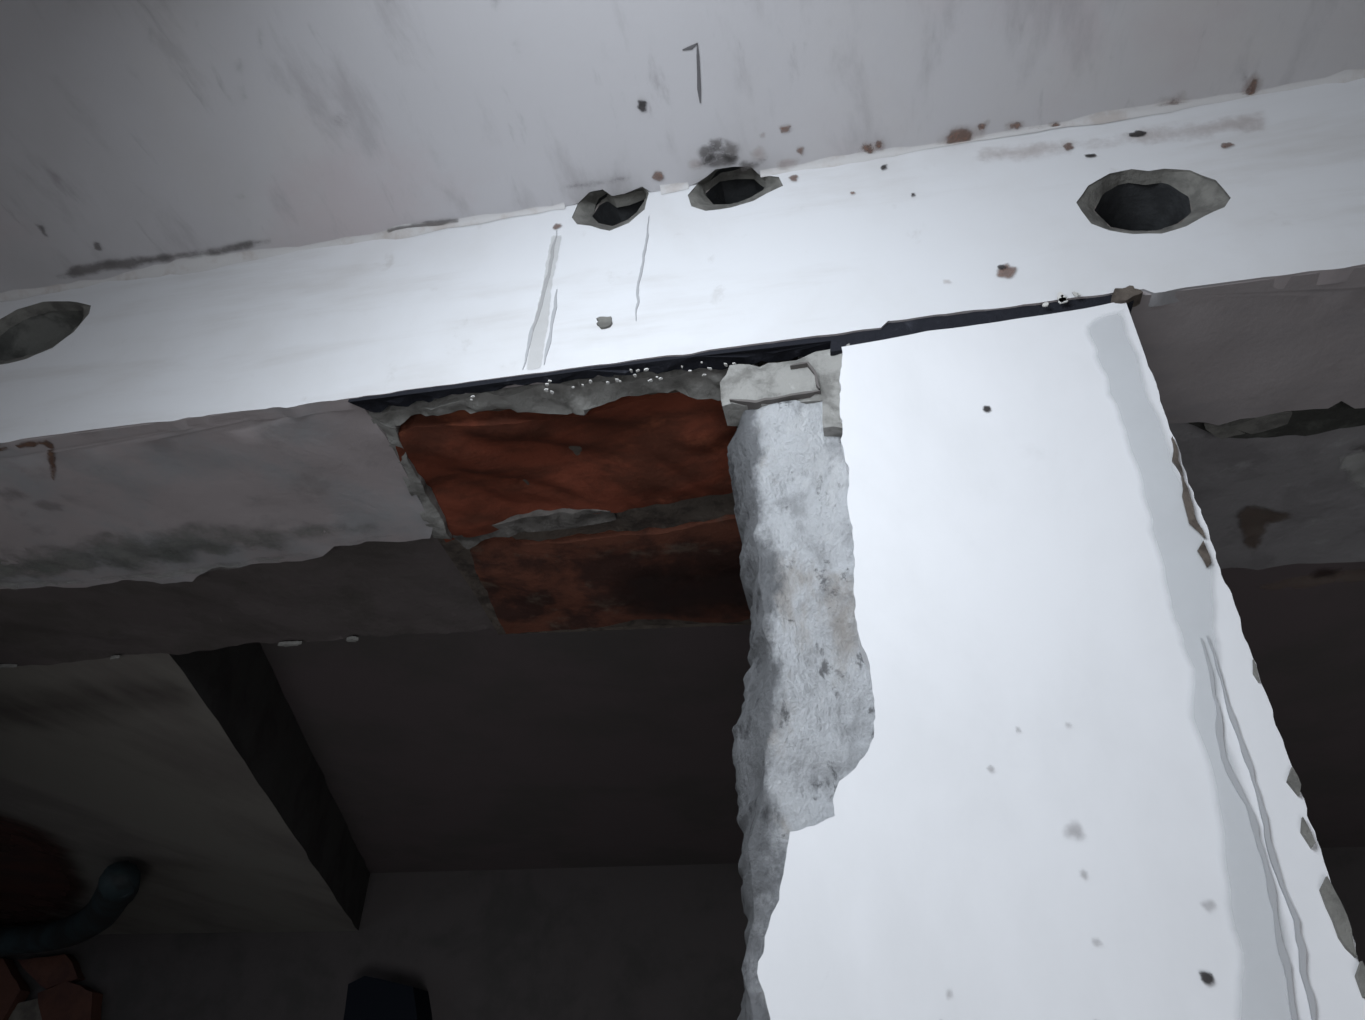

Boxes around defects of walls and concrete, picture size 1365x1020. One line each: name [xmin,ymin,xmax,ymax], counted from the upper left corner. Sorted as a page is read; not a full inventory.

corrosion [947,124,985,144]
corrosion [997,264,1016,277]
corrosion [0,441,56,480]
spalling [1171,437,1211,569]
flaking render [368,344,875,1020]